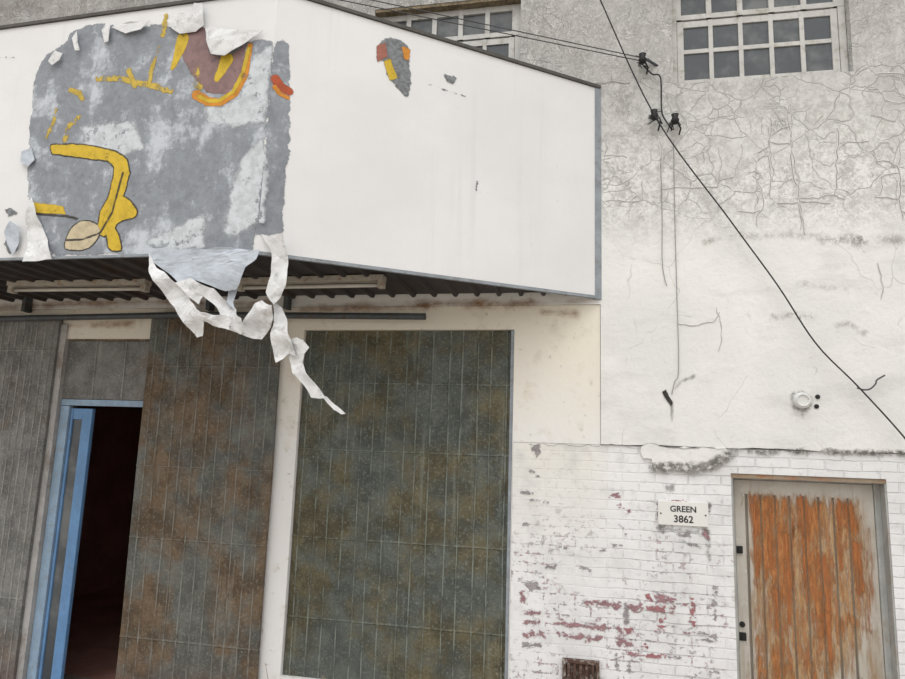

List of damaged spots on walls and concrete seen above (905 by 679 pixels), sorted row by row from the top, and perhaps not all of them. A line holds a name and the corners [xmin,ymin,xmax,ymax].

crack [605,72,905,235]
crack [876,263,884,300]
crack [678,307,722,352]
peeling [519,580,546,649]
peeling [553,593,718,672]